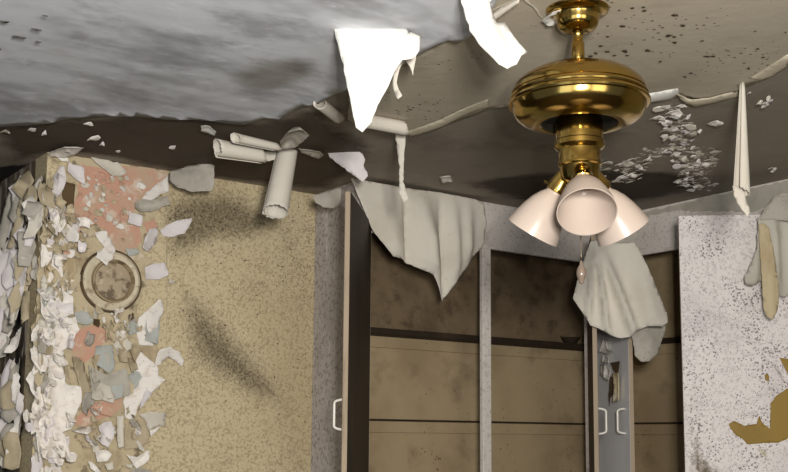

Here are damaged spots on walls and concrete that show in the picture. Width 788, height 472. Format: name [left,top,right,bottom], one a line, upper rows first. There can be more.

peeling [280,127,323,159]
peeling [600,104,724,192]
flaking render [31,122,192,472]
peeling [729,357,788,444]